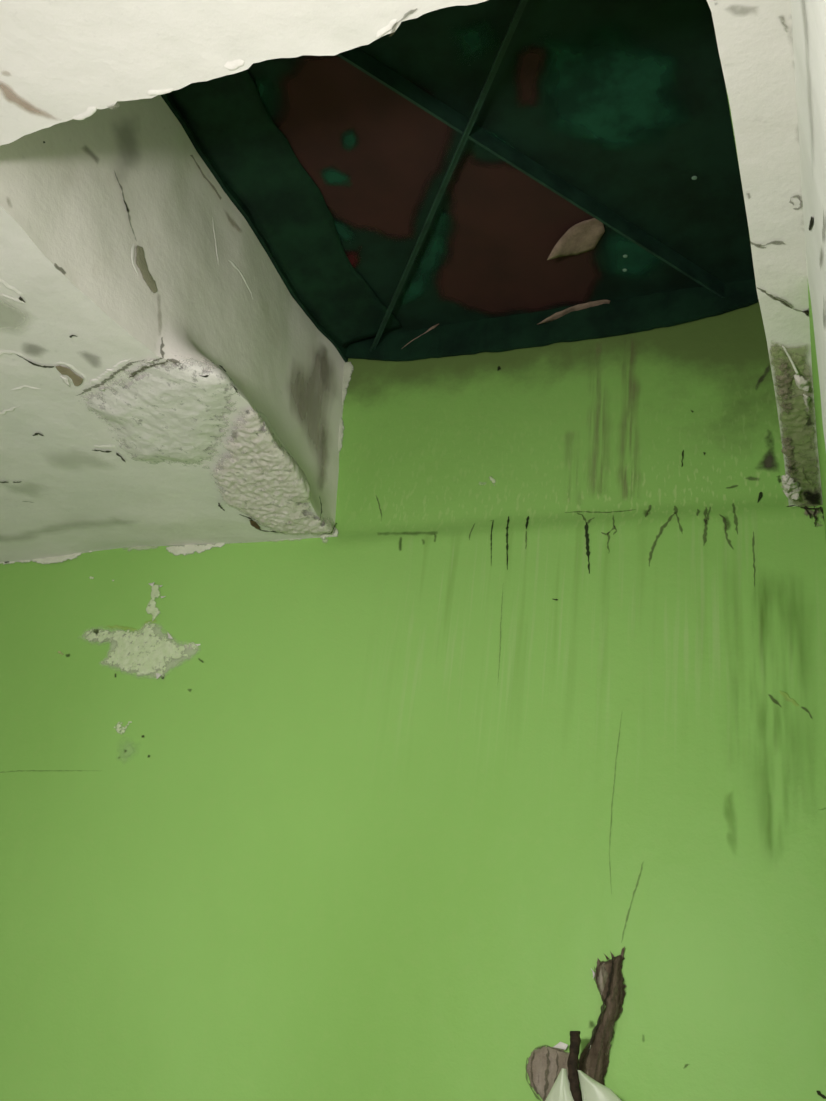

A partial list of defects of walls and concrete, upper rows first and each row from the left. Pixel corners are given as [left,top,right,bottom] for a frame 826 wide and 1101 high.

spalling [376,9,417,38]
spalling [147,88,174,96]
peeling [131,244,158,293]
flaking render [212,400,337,535]
leakage [762,440,776,469]
flaking render [770,344,824,527]
leakage [577,513,617,574]
crack [565,507,636,515]
leakage [649,506,682,566]
leakage [697,503,738,548]
spalling [85,582,203,679]
flaking render [526,947,626,1101]